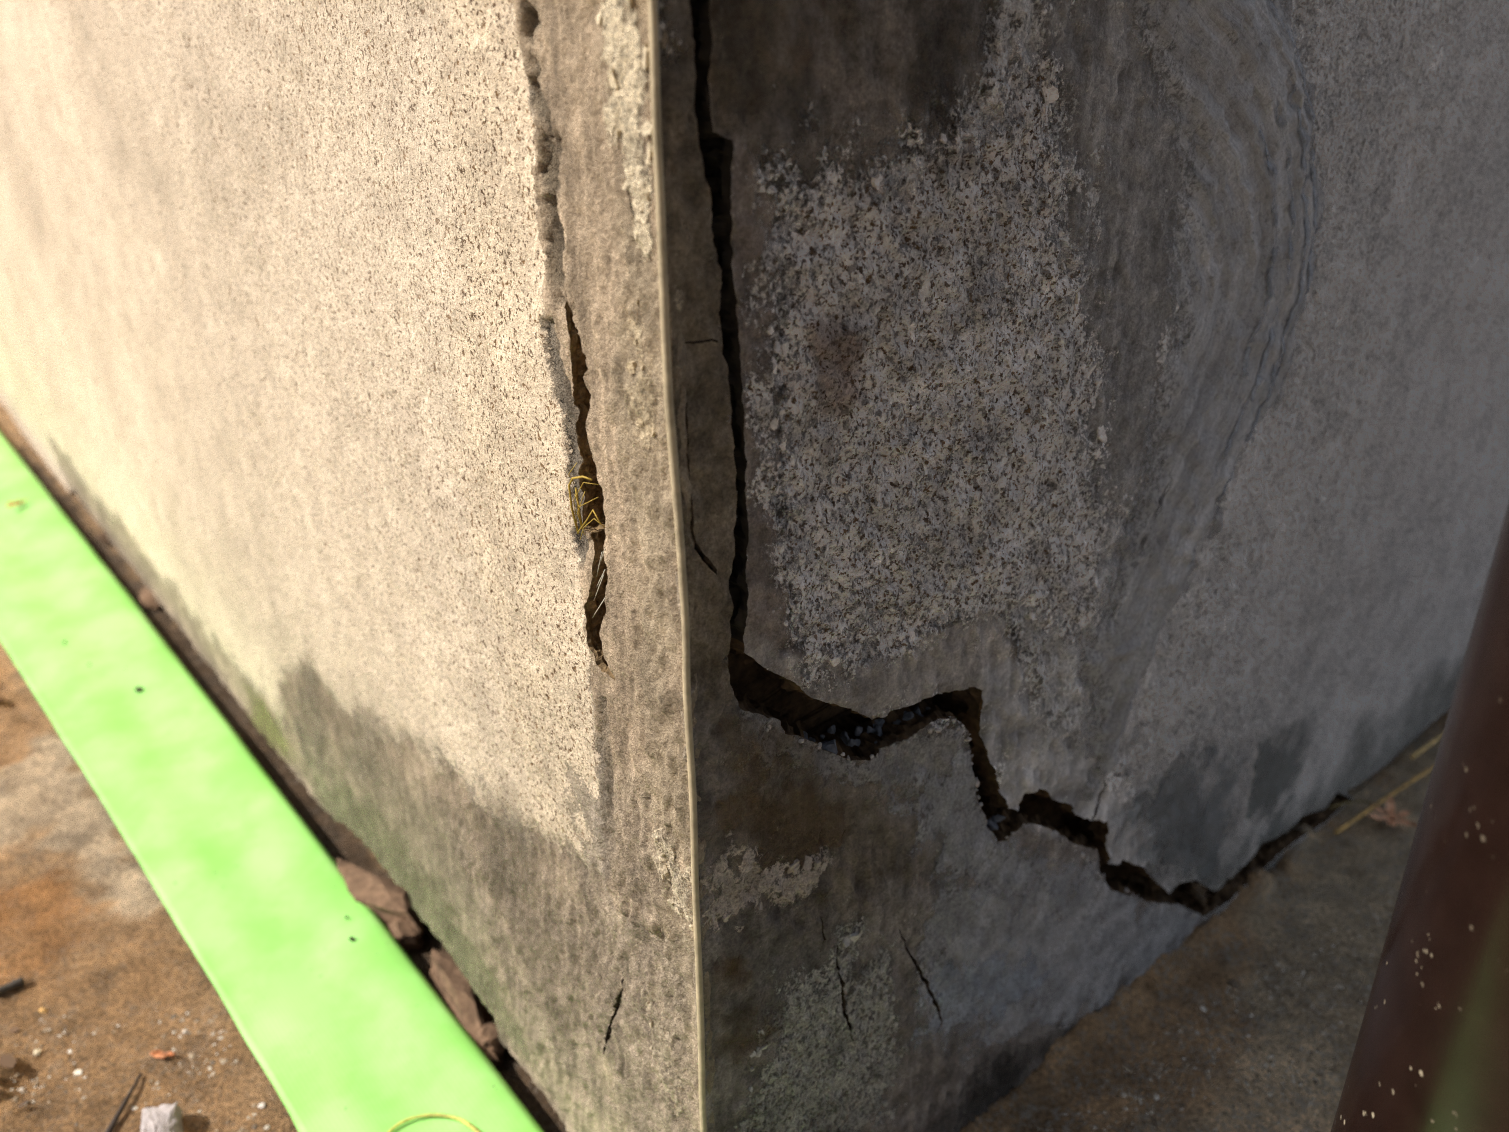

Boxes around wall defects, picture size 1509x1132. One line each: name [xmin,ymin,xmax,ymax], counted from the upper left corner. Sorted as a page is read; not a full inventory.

crack [564,293,615,680]
peeling [727,38,1126,692]
crack [685,0,1352,916]
crack [603,979,624,1054]